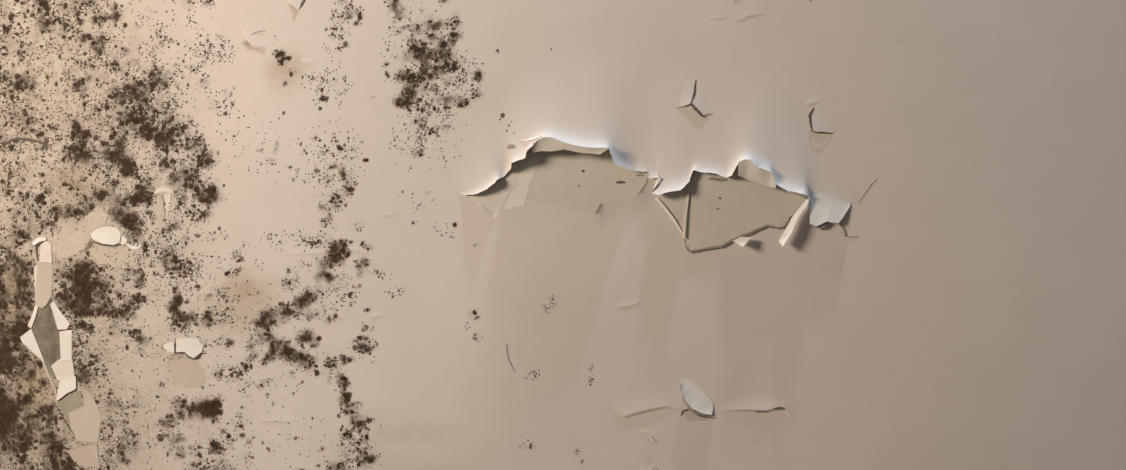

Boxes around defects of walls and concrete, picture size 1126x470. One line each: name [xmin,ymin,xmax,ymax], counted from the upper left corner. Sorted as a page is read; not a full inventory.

peeling [20,206,141,470]
peeling [163,338,217,389]
leakage [0,0,384,470]
leakage [380,0,485,162]
peeling [449,28,877,253]
peeling [679,380,713,421]